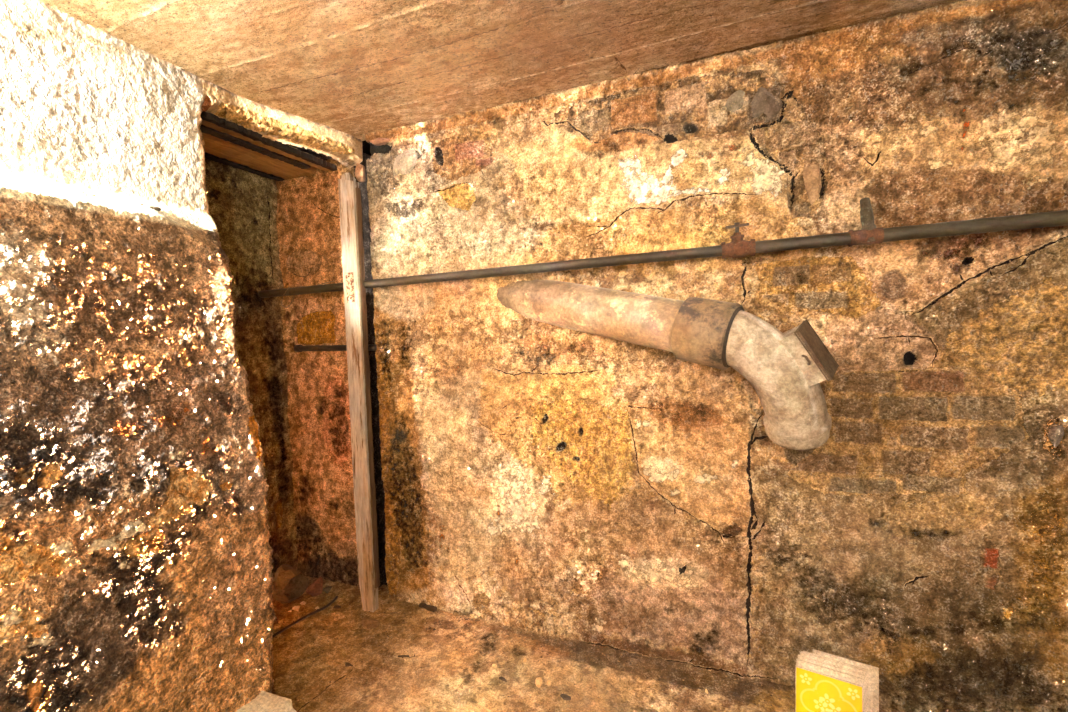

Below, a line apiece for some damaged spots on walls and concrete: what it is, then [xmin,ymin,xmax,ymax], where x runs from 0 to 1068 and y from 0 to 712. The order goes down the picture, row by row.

crack [255,1,718,103]
damp [923,31,1065,95]
spalling [553,70,833,219]
crack [749,90,826,206]
damp [978,99,1059,189]
crack [587,192,755,237]
damp [0,219,194,365]
crack [874,234,1068,372]
damp [0,424,109,548]
damp [51,519,201,646]
crack [582,405,787,681]
damp [0,633,91,712]